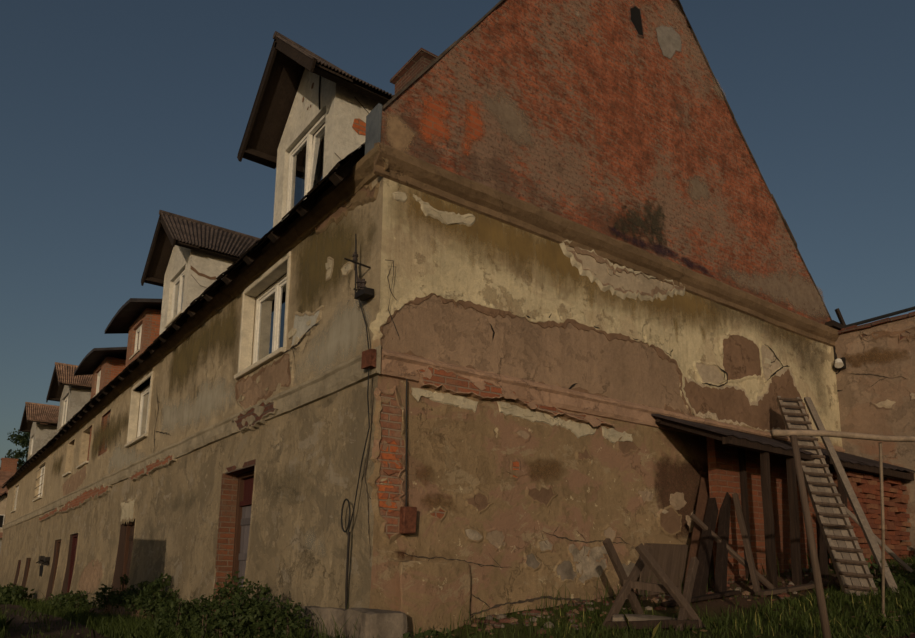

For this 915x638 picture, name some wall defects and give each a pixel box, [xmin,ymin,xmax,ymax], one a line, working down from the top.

spalling [314,181,380,234]
peeling [392,191,475,227]
water stain [408,188,730,337]
spalling [560,240,685,302]
spalling [231,305,325,433]
spalling [367,286,811,545]
flaking render [38,464,113,522]
peeling [120,494,137,525]
flaking render [128,454,177,482]
crack [361,377,373,555]
crack [404,553,512,568]
crack [470,527,631,618]